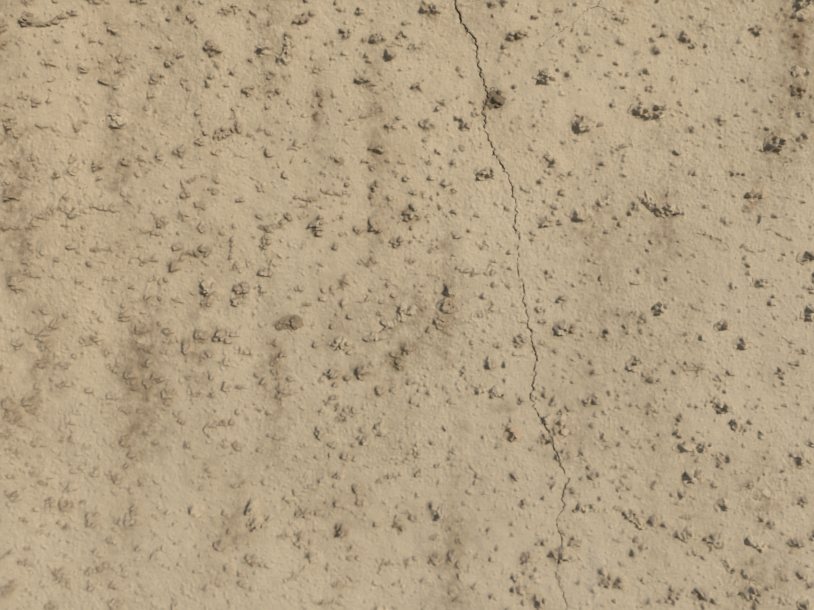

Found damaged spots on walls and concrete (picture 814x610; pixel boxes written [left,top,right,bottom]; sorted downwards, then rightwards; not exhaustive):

crack [455,0,570,609]